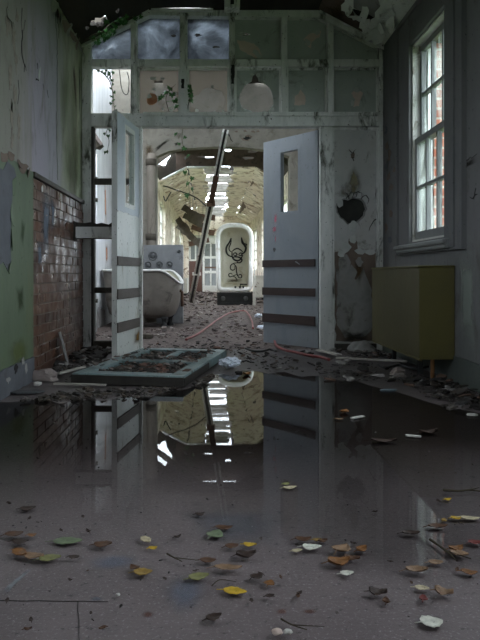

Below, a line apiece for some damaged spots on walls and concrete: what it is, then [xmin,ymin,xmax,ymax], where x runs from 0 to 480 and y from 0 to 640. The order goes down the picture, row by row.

peeling [318,0,395,45]
peeling [335,191,376,342]